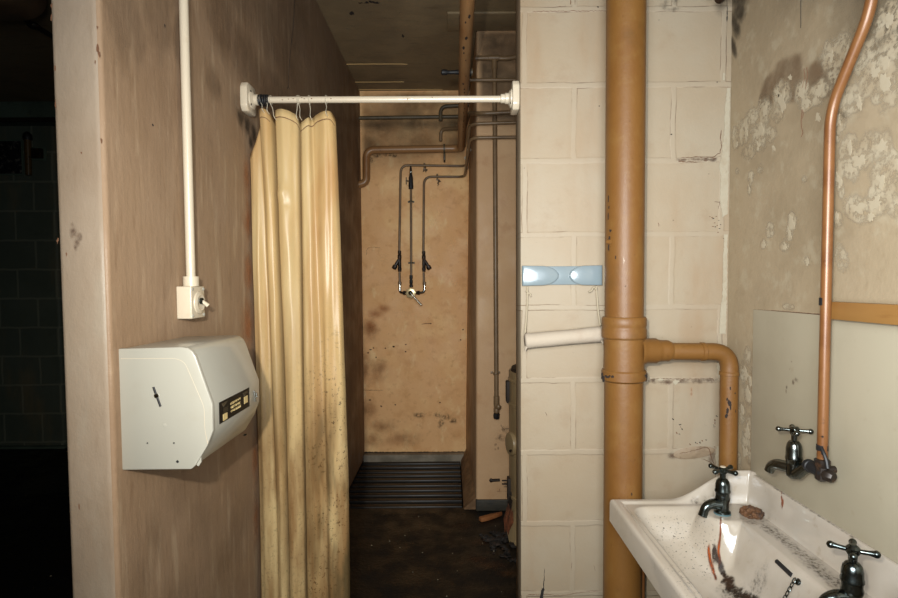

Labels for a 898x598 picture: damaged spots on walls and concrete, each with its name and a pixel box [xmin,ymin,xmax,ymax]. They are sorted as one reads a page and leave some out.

crack [678,134,722,162]
peeling [732,32,851,158]
peeling [834,0,898,227]